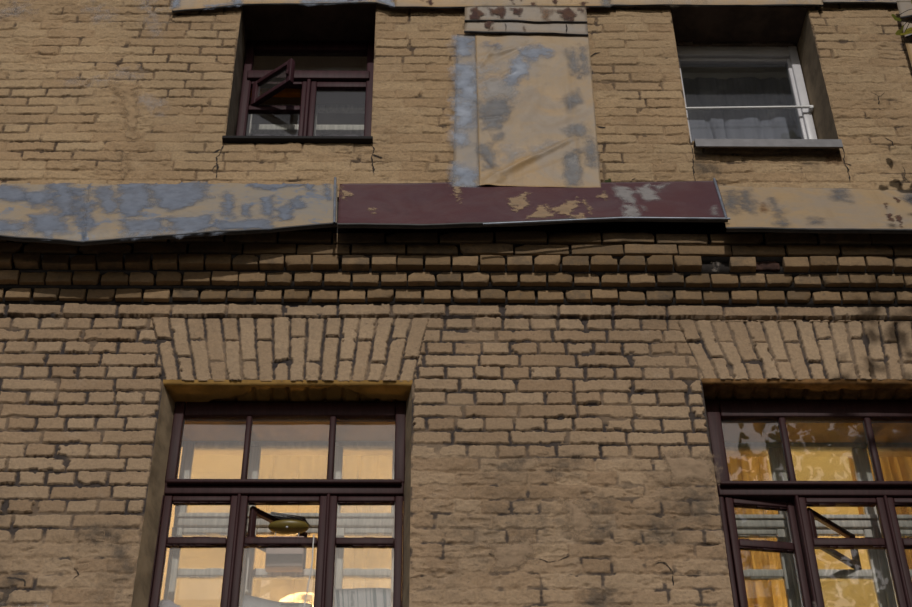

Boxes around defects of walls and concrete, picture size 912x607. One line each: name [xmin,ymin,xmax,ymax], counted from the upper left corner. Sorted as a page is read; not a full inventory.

peeling [452,36,511,144]
crack [212,143,224,178]
peeling [451,165,478,200]
peeling [0,181,354,239]
peeling [508,185,663,219]